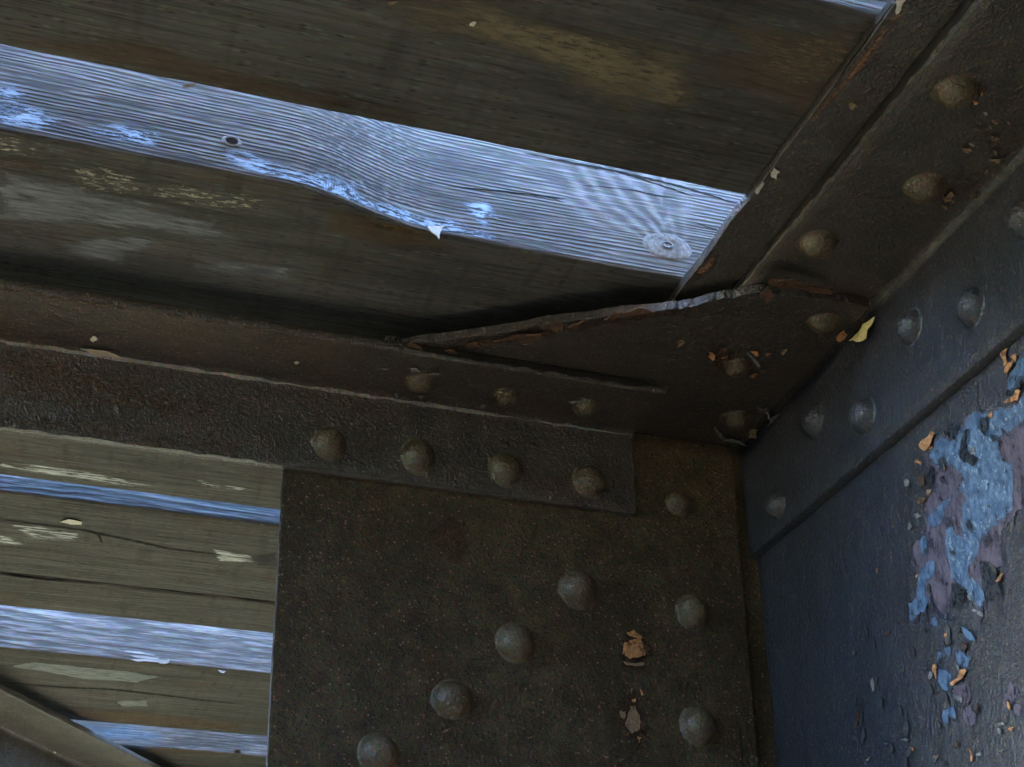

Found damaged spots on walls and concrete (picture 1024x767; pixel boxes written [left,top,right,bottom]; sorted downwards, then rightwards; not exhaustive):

corrosion [445,307,680,354]
crack [5,520,219,555]
peeling [903,348,1024,735]